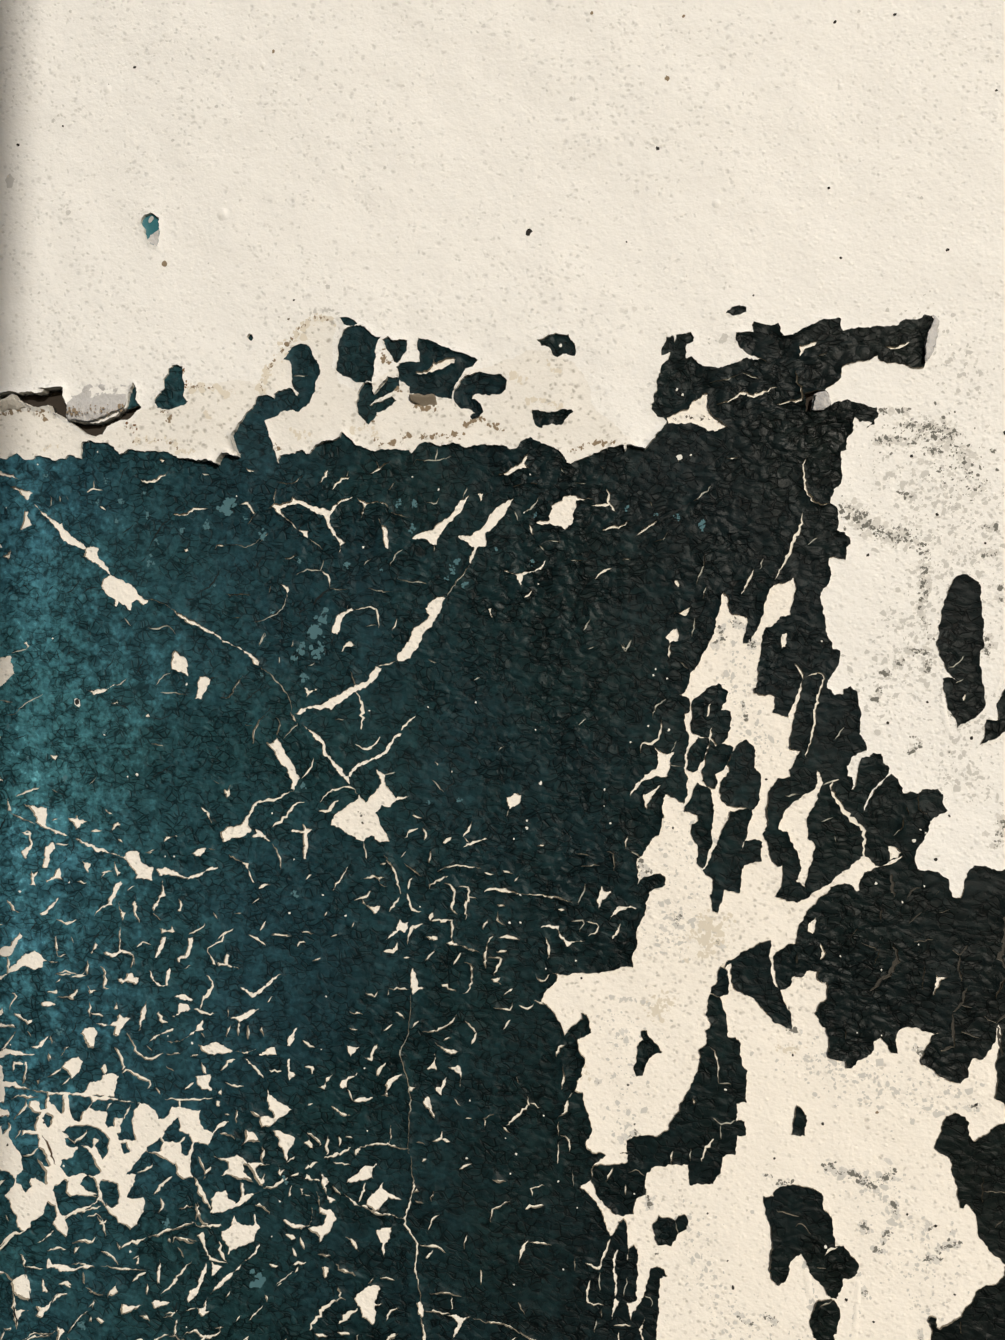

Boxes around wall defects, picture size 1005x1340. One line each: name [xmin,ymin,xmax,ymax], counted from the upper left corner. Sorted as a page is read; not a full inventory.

spalling [336,317,507,424]
spalling [667,394,726,431]
spalling [537,495,589,529]
crack [515,469,666,577]
crack [741,459,829,594]
crack [51,467,465,735]
crack [336,661,415,775]
spalling [542,574,1005,1340]
spalling [190,1021,462,1117]
crack [0,759,664,1340]
spalling [0,1037,400,1329]
crack [670,1118,733,1161]